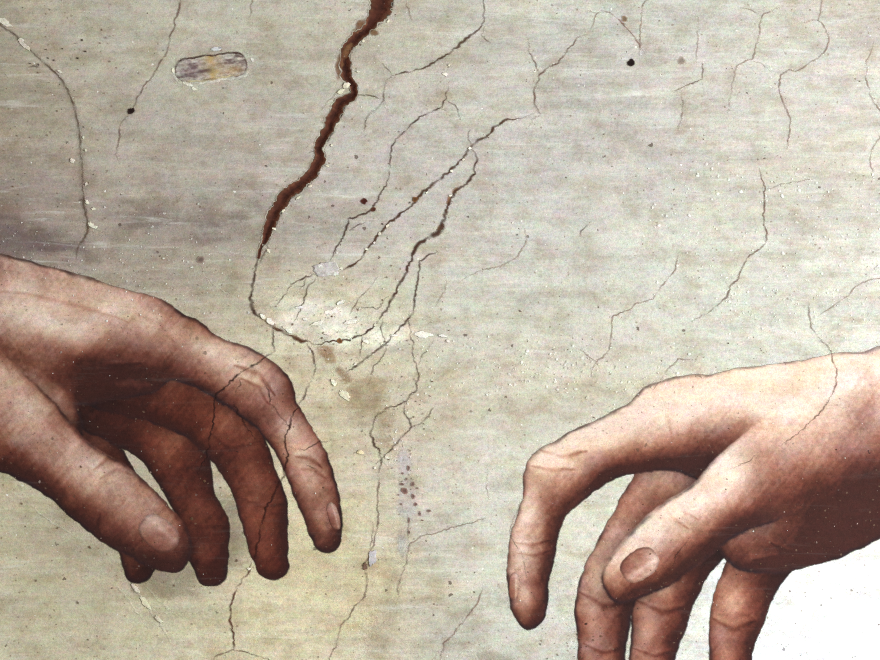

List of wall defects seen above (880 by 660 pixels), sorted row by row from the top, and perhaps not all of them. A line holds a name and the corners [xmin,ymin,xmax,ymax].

crack [0,18,98,248]
crack [118,3,181,145]
crack [532,40,576,103]
crack [743,0,830,140]
crack [722,176,768,301]
crack [201,0,518,653]
crack [586,260,678,369]